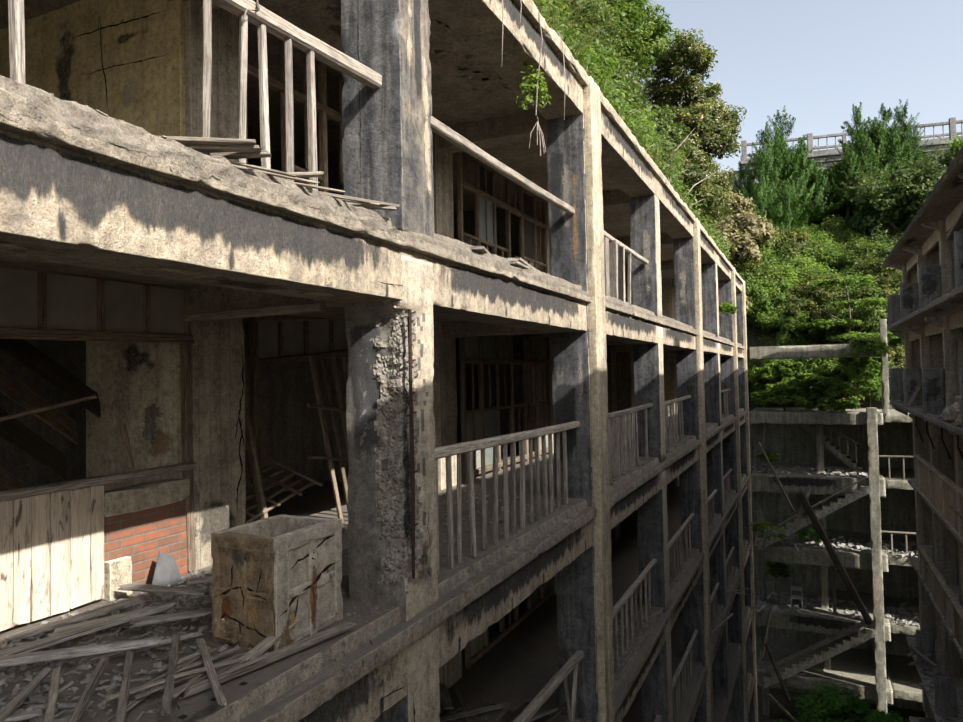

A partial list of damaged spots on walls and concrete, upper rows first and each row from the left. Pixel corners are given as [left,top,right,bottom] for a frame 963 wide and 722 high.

crack [72,10,168,107]
damp [125,345,154,371]
crack [235,343,245,522]
spalling [373,301,424,599]